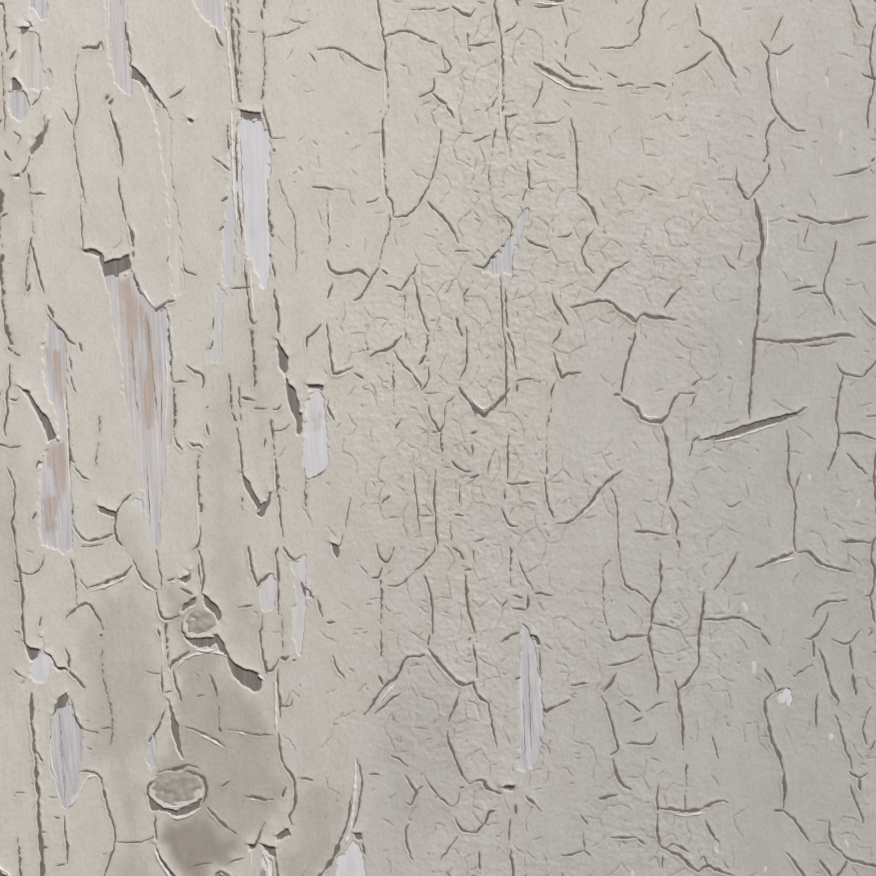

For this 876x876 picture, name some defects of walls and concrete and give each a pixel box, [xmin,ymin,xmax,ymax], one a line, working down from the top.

peeling [9,78,42,121]
peeling [81,0,164,108]
peeling [222,110,271,288]
peeling [23,268,173,554]
peeling [302,385,329,478]
crack [301,0,876,876]
peeling [260,574,278,612]
peeling [291,555,309,653]
peeling [30,650,54,682]
peeling [49,693,83,808]
peeling [517,624,545,771]
peeling [336,841,366,876]